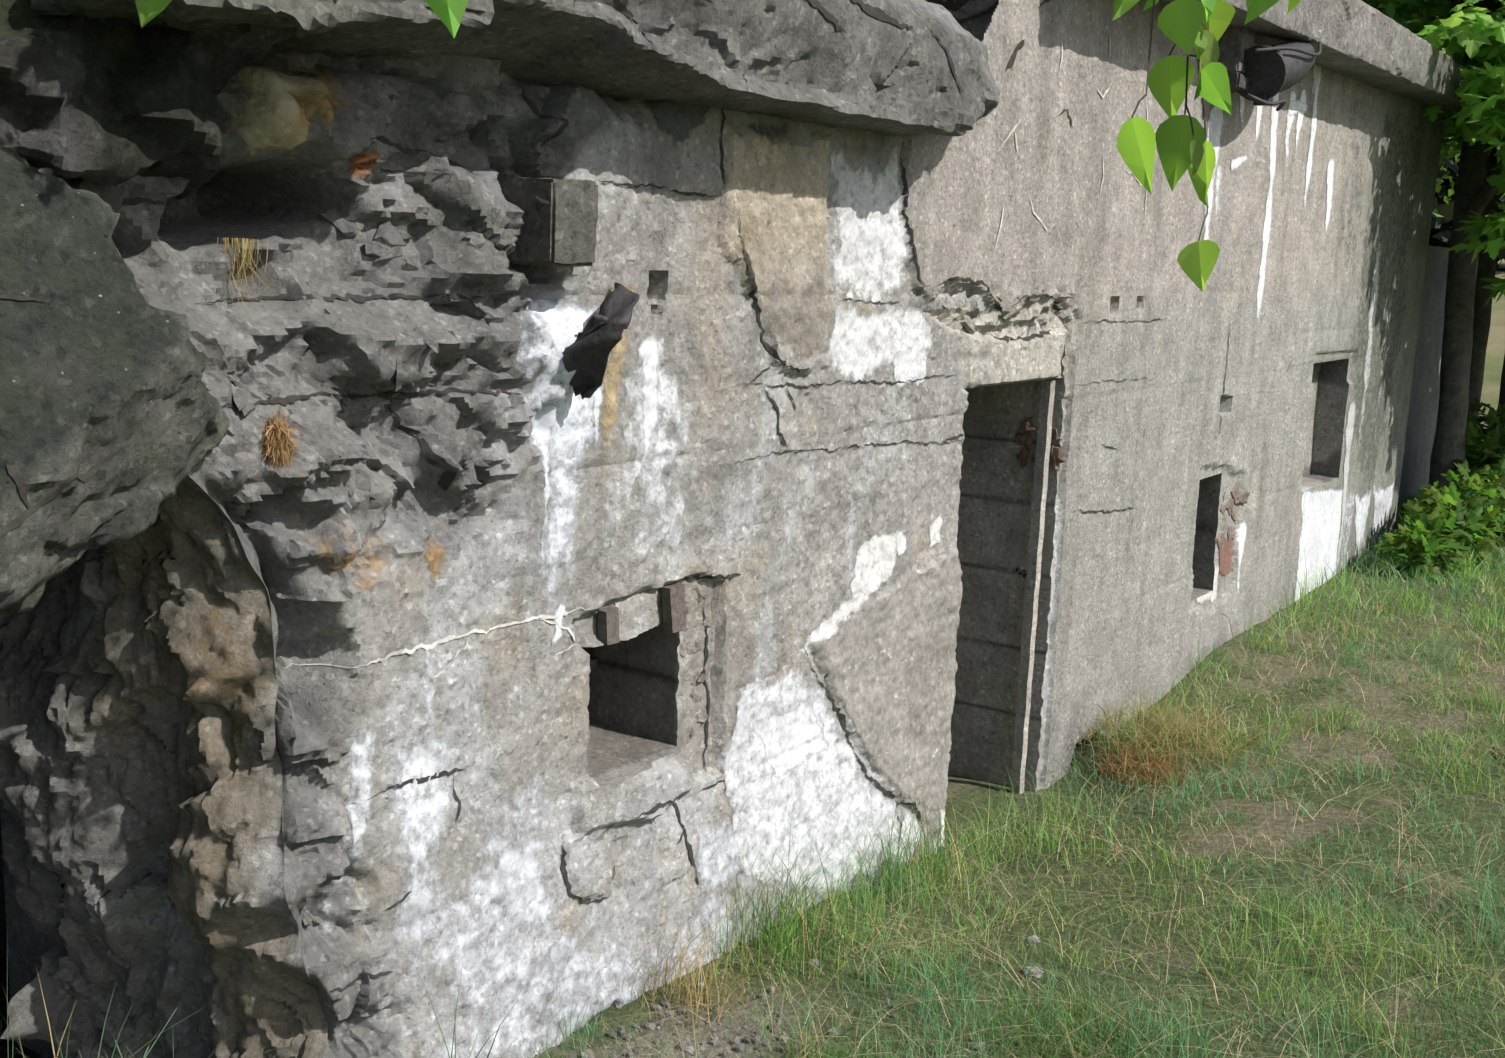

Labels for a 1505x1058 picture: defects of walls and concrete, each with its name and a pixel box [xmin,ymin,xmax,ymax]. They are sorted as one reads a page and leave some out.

crack [599,109,964,468]
peeling [770,145,975,388]
leakage [1204,65,1422,565]
crack [286,607,590,678]
leakage [516,300,603,644]
leakage [623,337,692,565]
crack [803,646,922,833]
leakage [1235,521,1247,592]
crack [560,835,615,905]